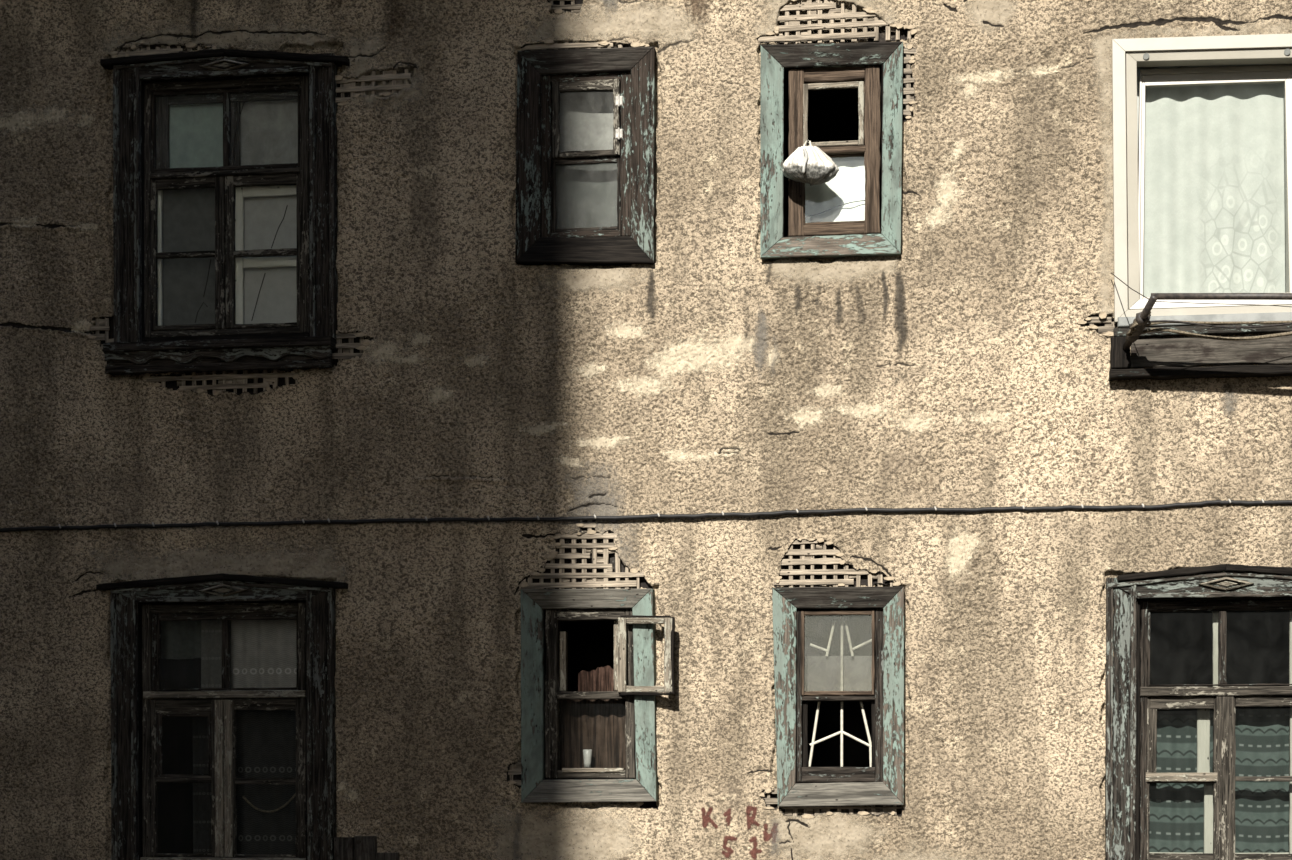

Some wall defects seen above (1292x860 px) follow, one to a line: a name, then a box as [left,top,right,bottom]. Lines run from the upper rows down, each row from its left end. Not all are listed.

spalling [544,0,583,14]
peeling [335,36,422,108]
spalling [757,0,918,121]
crack [1015,14,1292,72]
crack [0,221,76,229]
crack [0,322,93,334]
leakage [881,272,907,352]
spalling [518,471,652,589]
spalling [773,538,901,587]
spalling [636,799,660,809]
peeling [486,807,638,860]